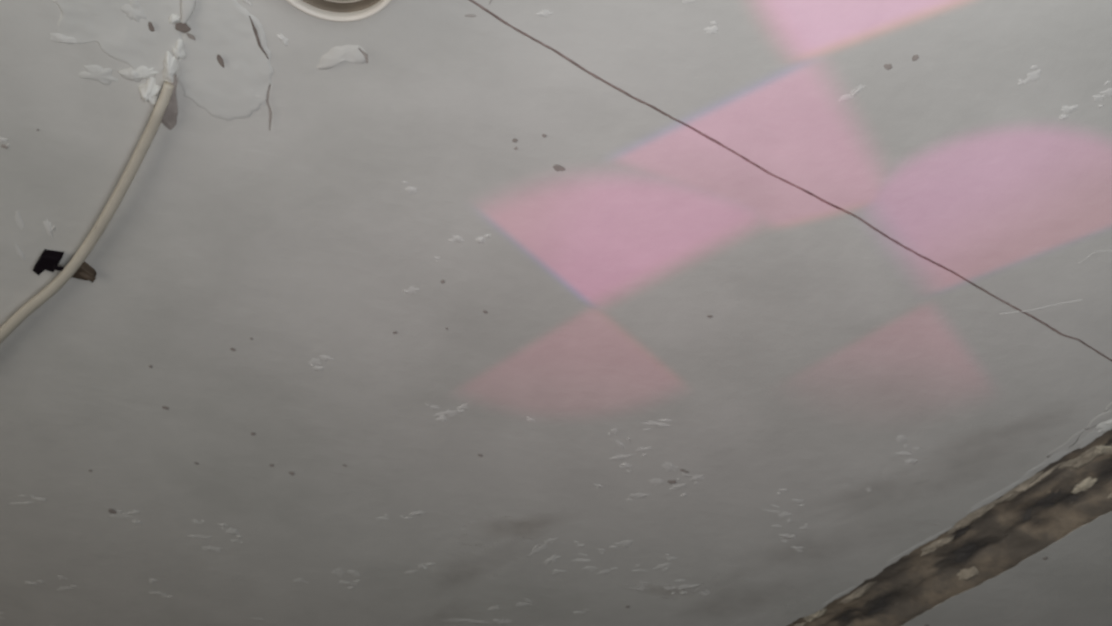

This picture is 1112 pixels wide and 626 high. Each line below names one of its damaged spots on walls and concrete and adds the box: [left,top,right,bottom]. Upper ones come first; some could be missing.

peeling [49,0,289,130]
crack [469,0,1112,362]
spalling [787,419,1112,626]